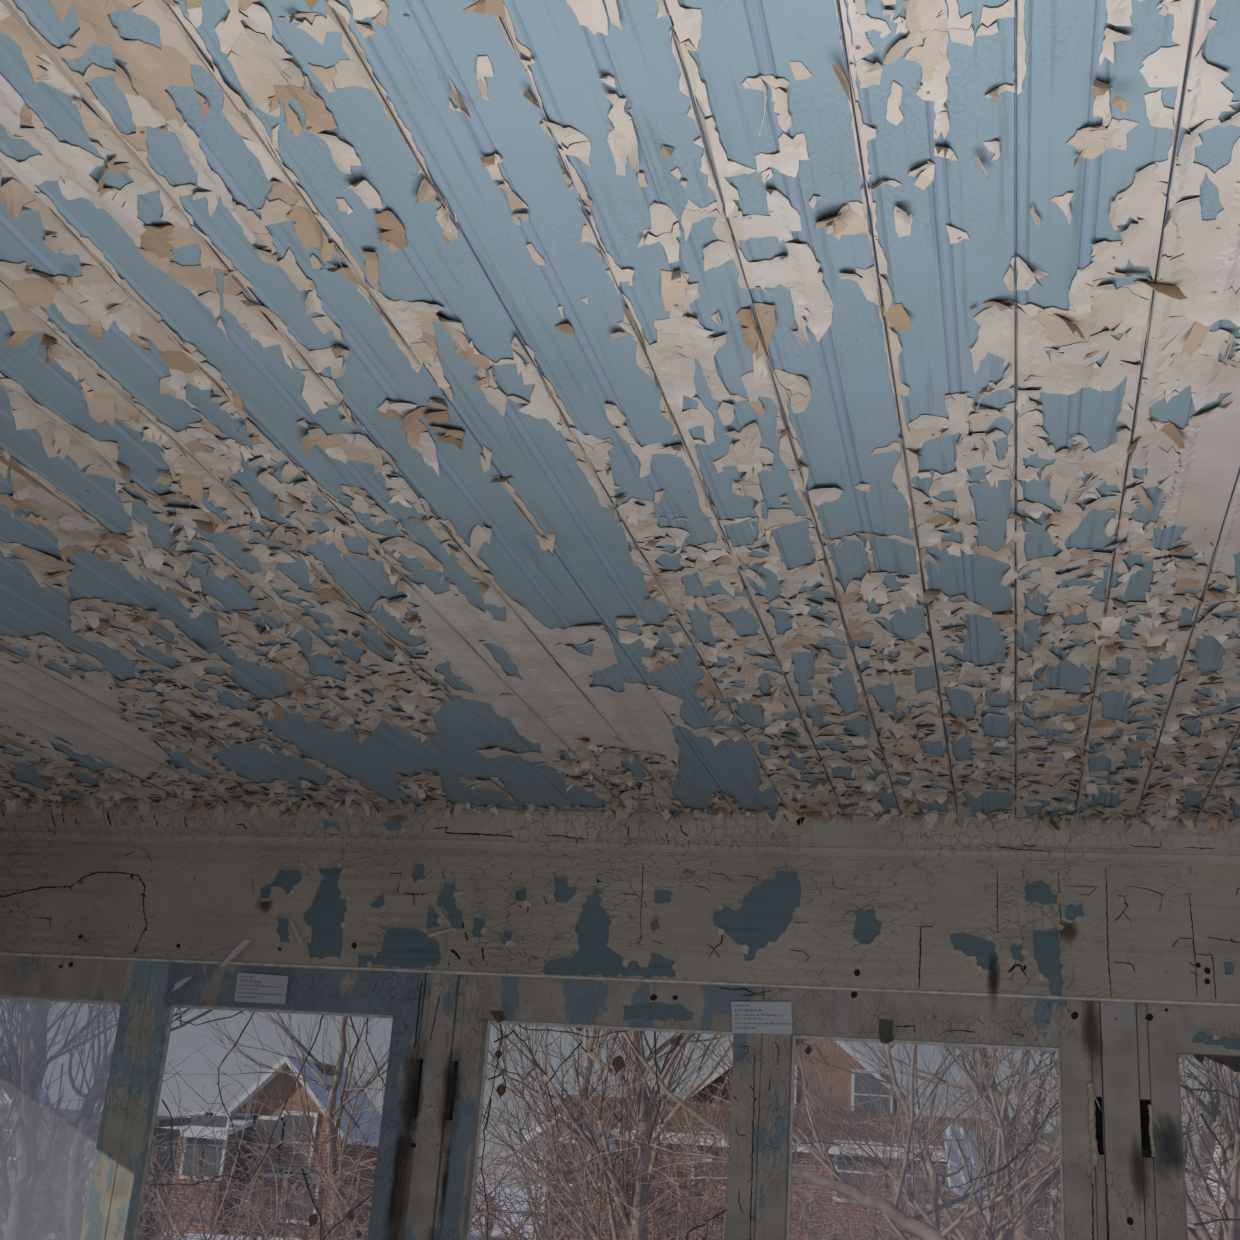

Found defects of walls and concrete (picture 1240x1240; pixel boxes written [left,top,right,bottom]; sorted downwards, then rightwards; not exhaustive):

peeling [0,0,1240,840]
crack [0,810,188,954]
peeling [257,861,470,970]
peeling [540,871,681,978]
peeling [707,865,806,965]
peeling [848,903,887,949]
peeling [945,876,1089,995]
crack [980,844,1240,998]
crack [1130,841,1215,849]
peeling [1188,1027,1240,1055]